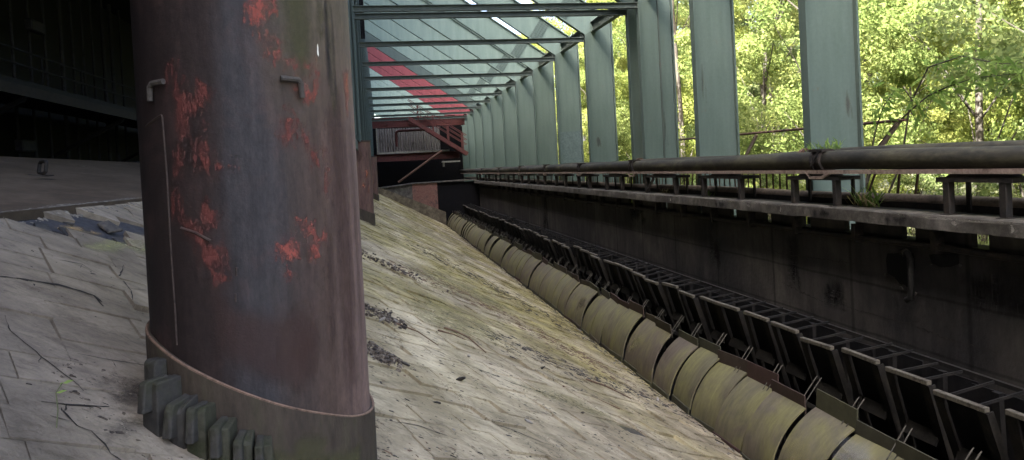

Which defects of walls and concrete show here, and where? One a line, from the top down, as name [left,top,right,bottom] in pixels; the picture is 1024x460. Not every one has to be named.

crack [0,260,103,306]
crack [5,316,121,460]